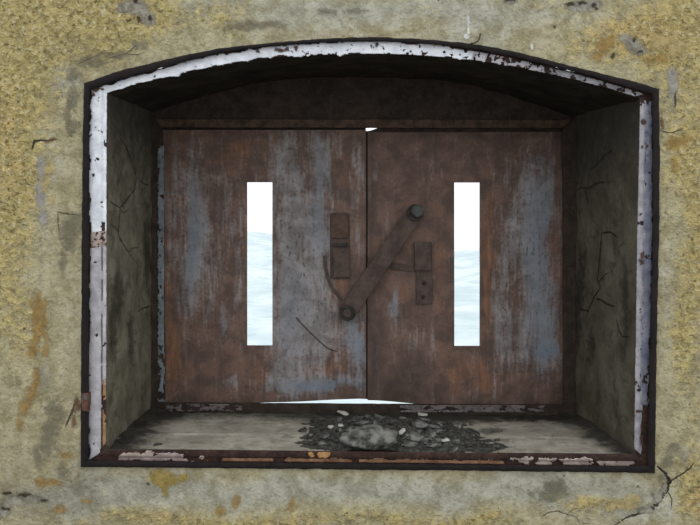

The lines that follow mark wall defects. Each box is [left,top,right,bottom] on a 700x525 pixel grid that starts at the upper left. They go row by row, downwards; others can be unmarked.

spalling [619,25,682,56]
peeling [88,41,653,460]
crack [576,231,629,337]
peeling [117,450,204,462]
peeling [510,456,635,466]
crack [615,463,694,525]